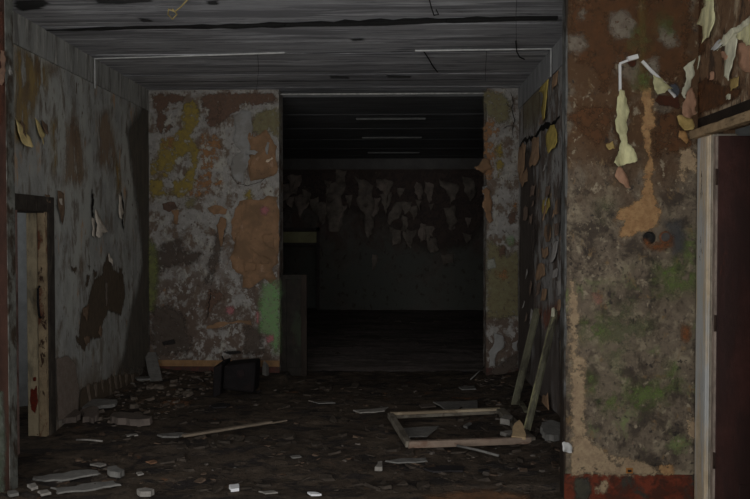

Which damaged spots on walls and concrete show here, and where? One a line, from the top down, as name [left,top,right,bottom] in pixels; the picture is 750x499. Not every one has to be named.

crack [46,16,558,31]
peeling [151,93,185,149]
peeling [201,91,276,127]
crack [503,92,560,147]
peeling [567,0,706,182]
peeling [697,78,741,117]
peeling [248,130,278,181]
peeling [482,186,493,223]
peeling [71,254,125,351]
peeling [156,196,280,355]
peeling [506,143,675,499]